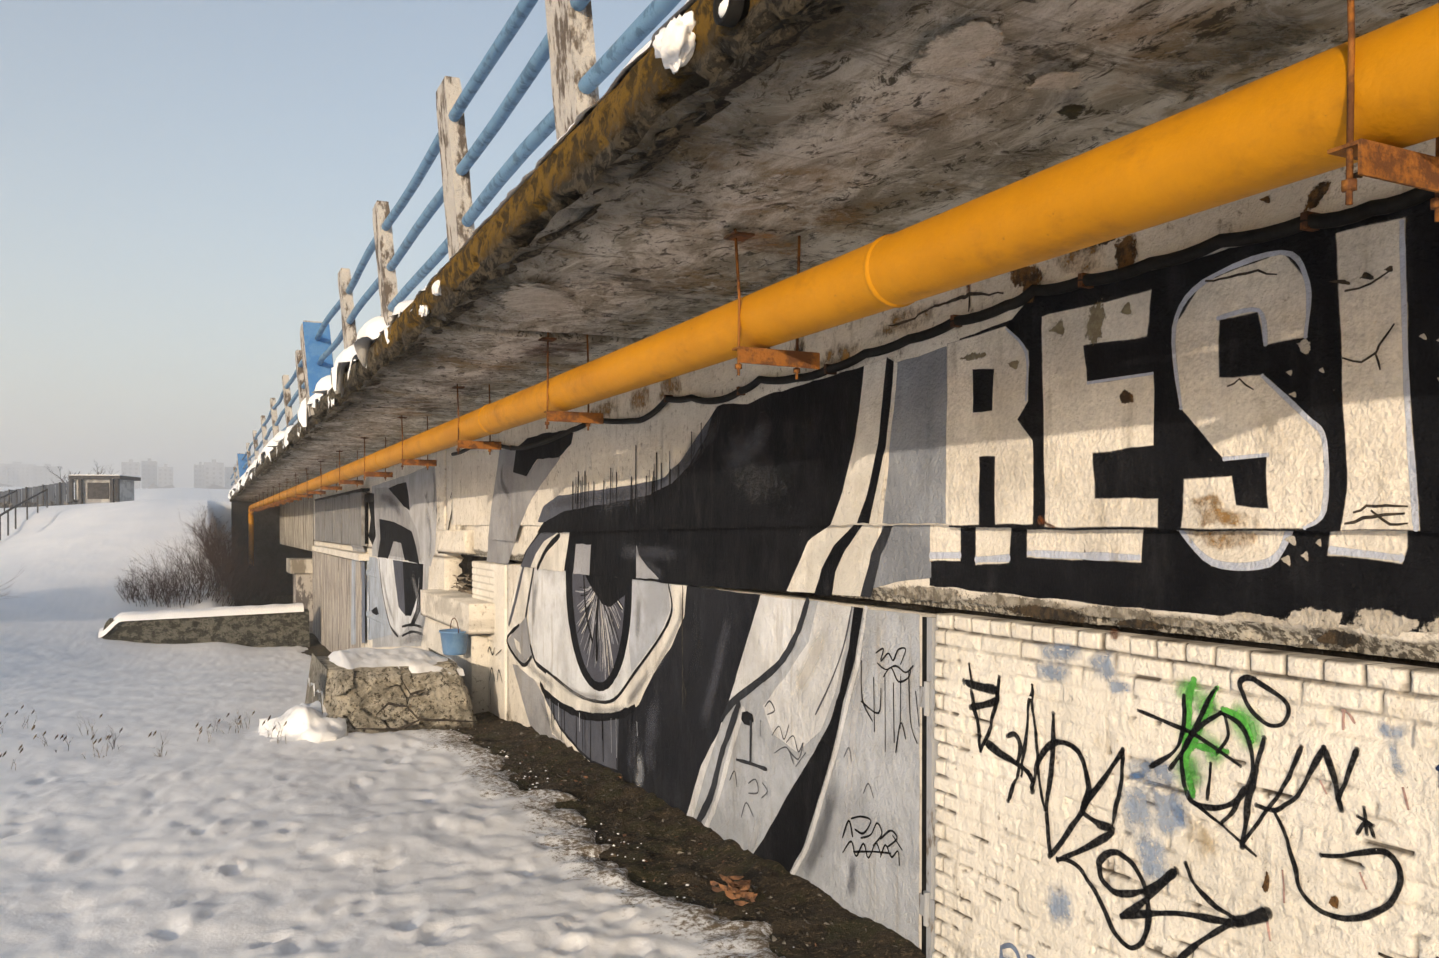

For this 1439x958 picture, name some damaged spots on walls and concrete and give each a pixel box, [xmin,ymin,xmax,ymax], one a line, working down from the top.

crack [1342,323,1395,370]
crack [1344,504,1408,526]
peeling [885,585,1439,648]